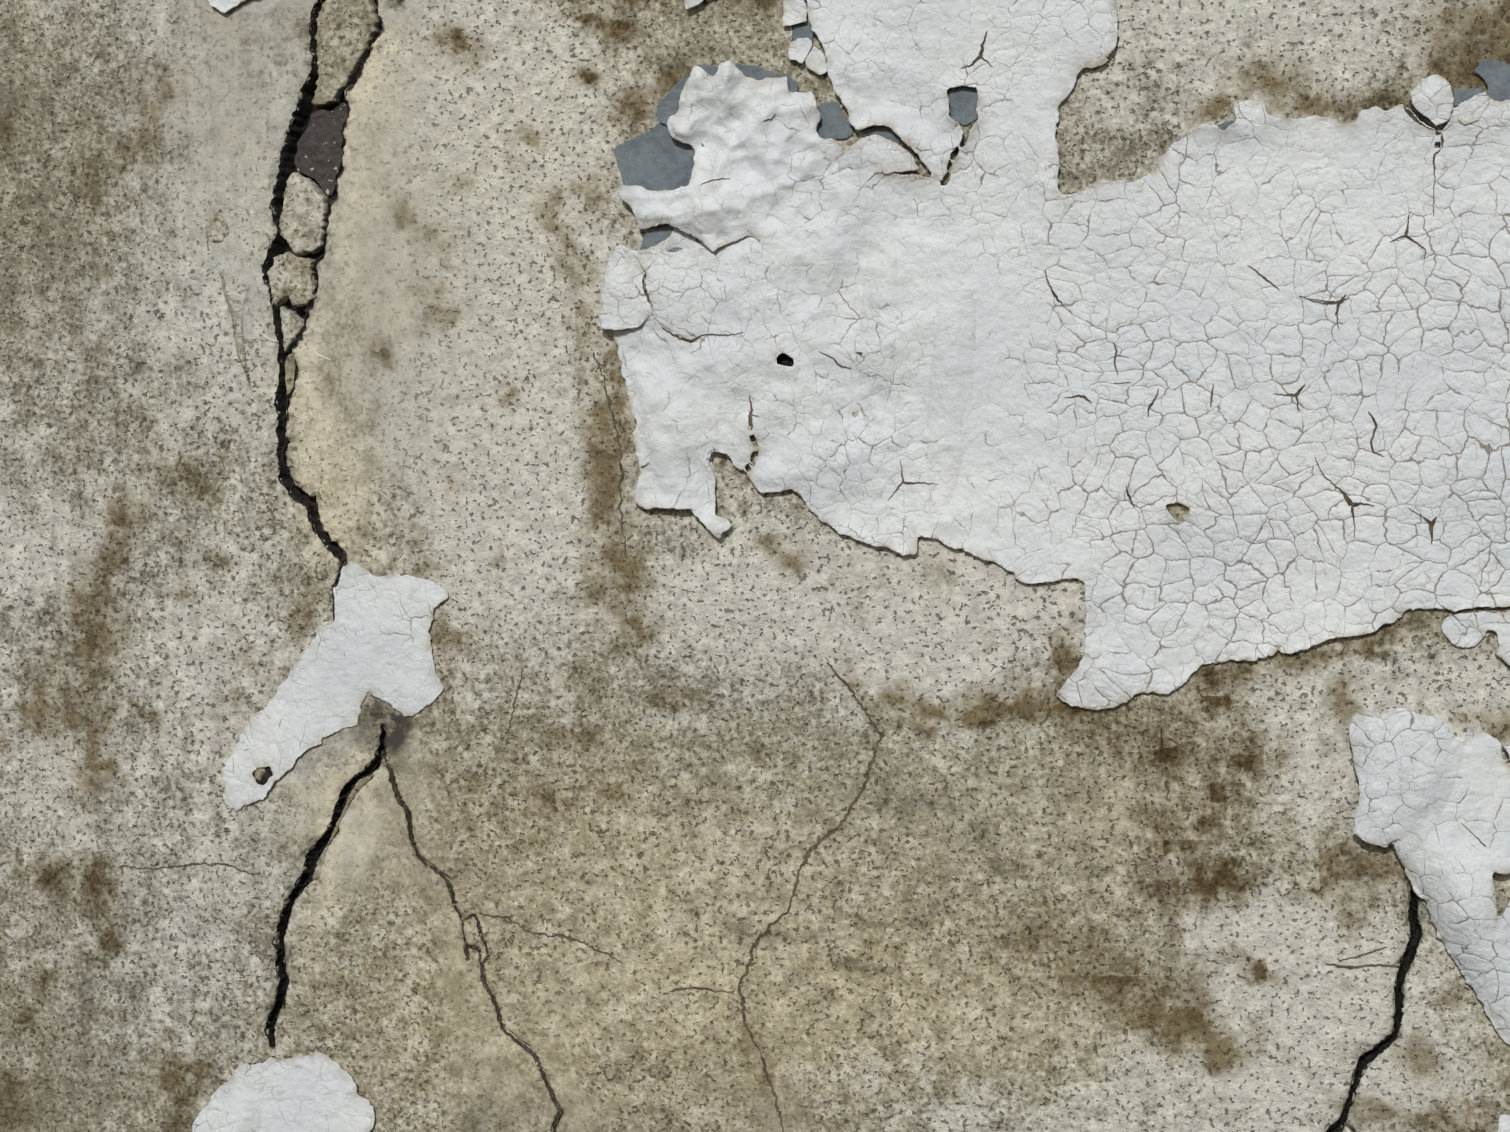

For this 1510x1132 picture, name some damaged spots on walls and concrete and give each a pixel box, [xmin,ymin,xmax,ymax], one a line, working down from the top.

peeling [208,0,246,13]
crack [1391,102,1444,258]
spalling [219,272,251,390]
crack [261,0,383,621]
peeling [597,0,1510,710]
crack [1247,265,1349,329]
crack [1315,457,1437,545]
peeling [223,561,449,812]
crack [264,724,622,1132]
crack [1328,889,1422,1132]
peeling [192,1051,375,1132]
peeling [1497,1114,1510,1132]